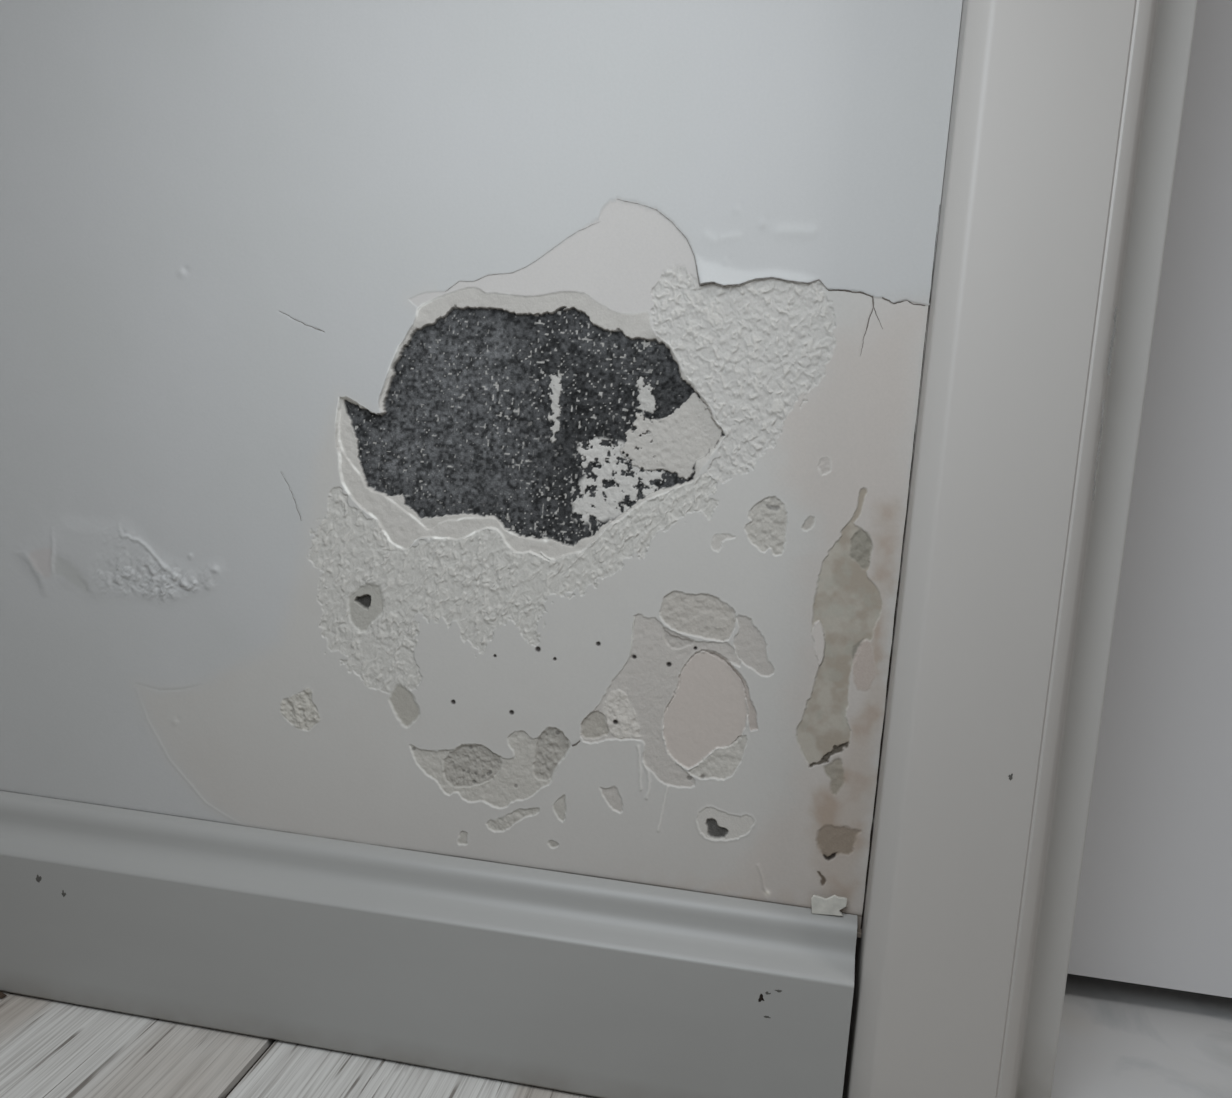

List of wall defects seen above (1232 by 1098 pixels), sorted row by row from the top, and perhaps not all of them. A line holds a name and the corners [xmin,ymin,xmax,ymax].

spalling [349,584,384,632]
spalling [390,685,420,727]
spalling [337,287,725,560]
spalling [411,591,775,831]
crack [445,199,940,929]
spalling [697,807,755,841]
peeling [696,252,926,794]
damp [695,289,931,938]